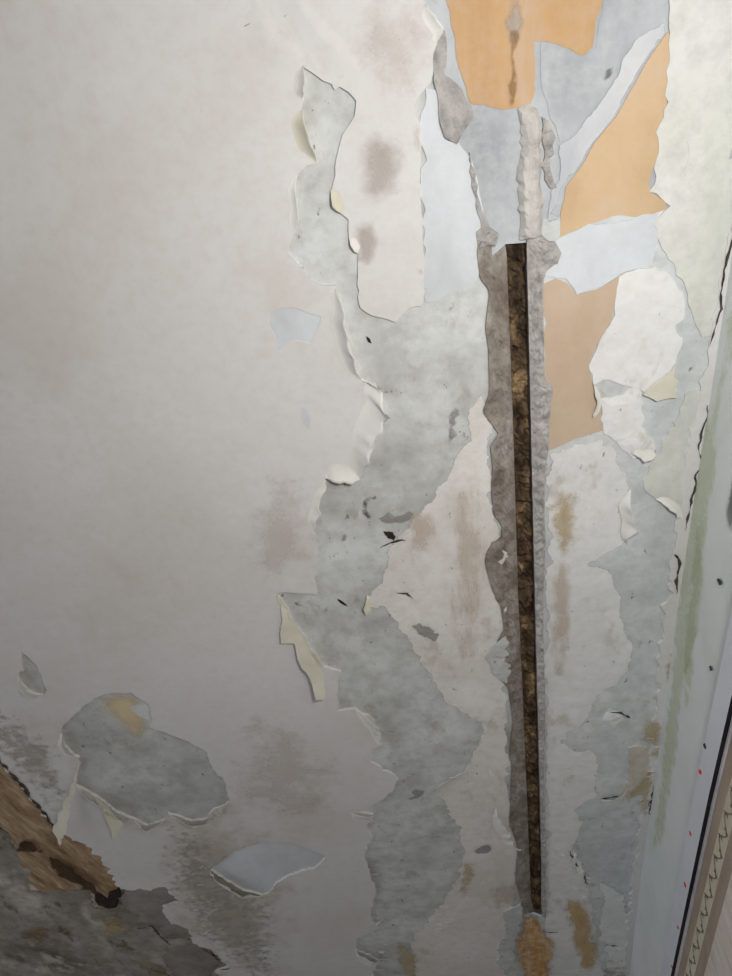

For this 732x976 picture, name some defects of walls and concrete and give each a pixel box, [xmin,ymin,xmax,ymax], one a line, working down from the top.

crack [710,240,732,344]
peeling [276,0,732,976]
crack [685,405,708,530]
peeling [17,654,46,700]
flaking render [0,693,238,976]
peeling [185,841,325,911]
corrosion [516,917,554,976]
corrosion [568,901,596,968]